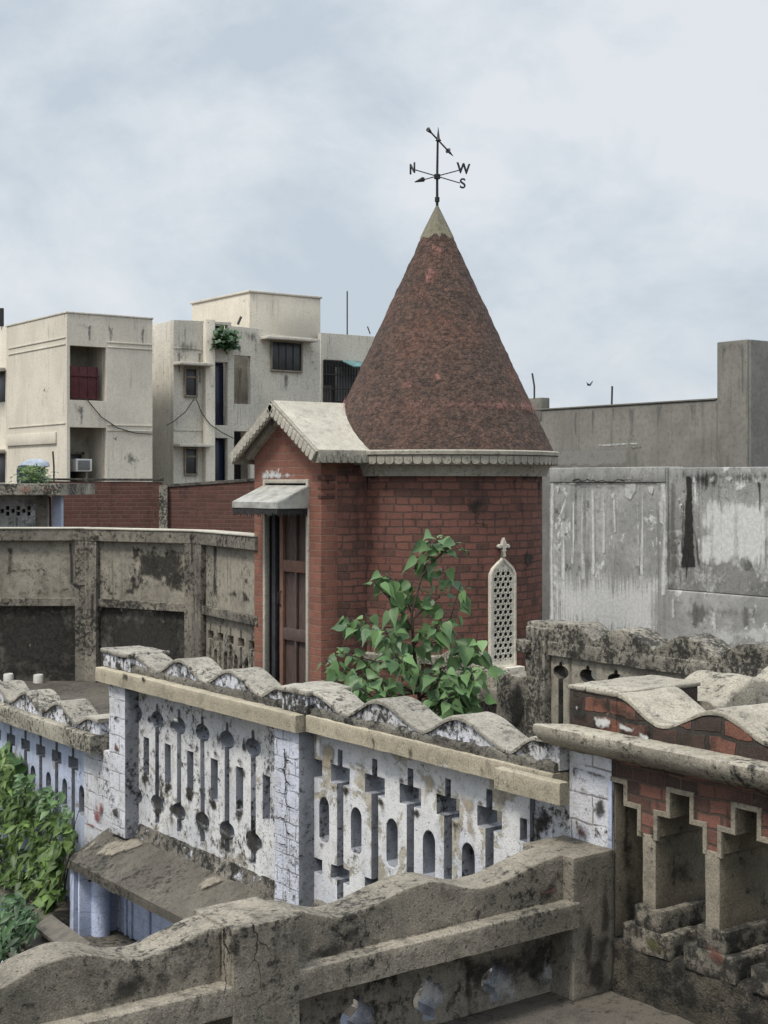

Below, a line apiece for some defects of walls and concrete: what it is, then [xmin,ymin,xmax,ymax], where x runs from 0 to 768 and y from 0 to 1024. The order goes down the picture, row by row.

damp [126,535,194,593]
damp [555,491,658,631]
damp [671,472,766,578]
crack [276,749,296,859]
crack [222,924,271,998]